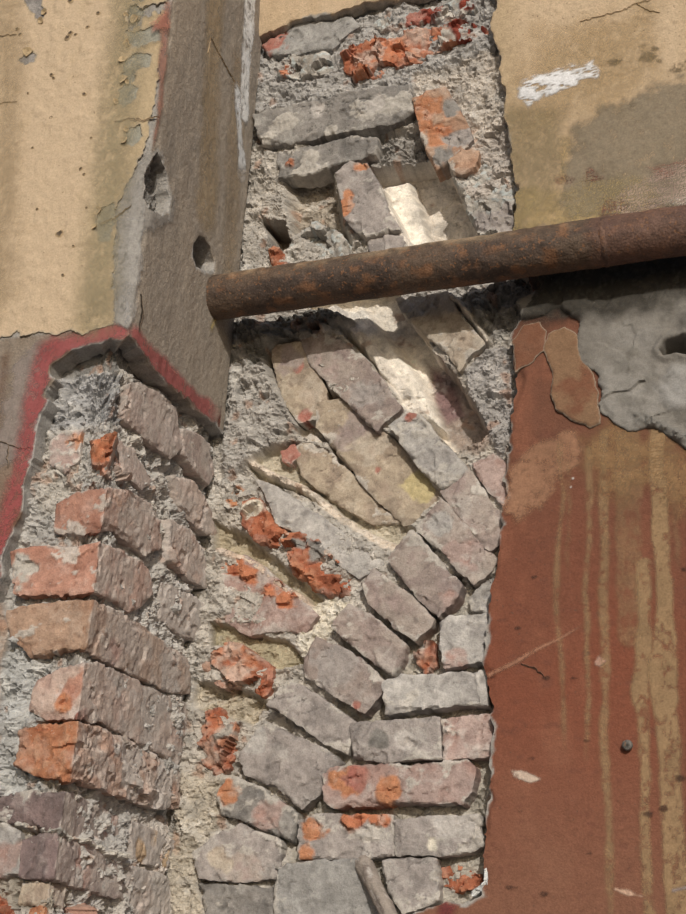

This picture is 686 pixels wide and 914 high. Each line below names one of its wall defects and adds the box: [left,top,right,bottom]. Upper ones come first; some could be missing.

peeling [20,47,36,65]
peeling [25,0,47,24]
peeling [113,0,170,139]
spalling [239,0,518,271]
damp [505,75,686,219]
crack [580,0,660,22]
peeling [85,150,174,328]
spalling [0,279,601,914]
damp [586,427,686,914]